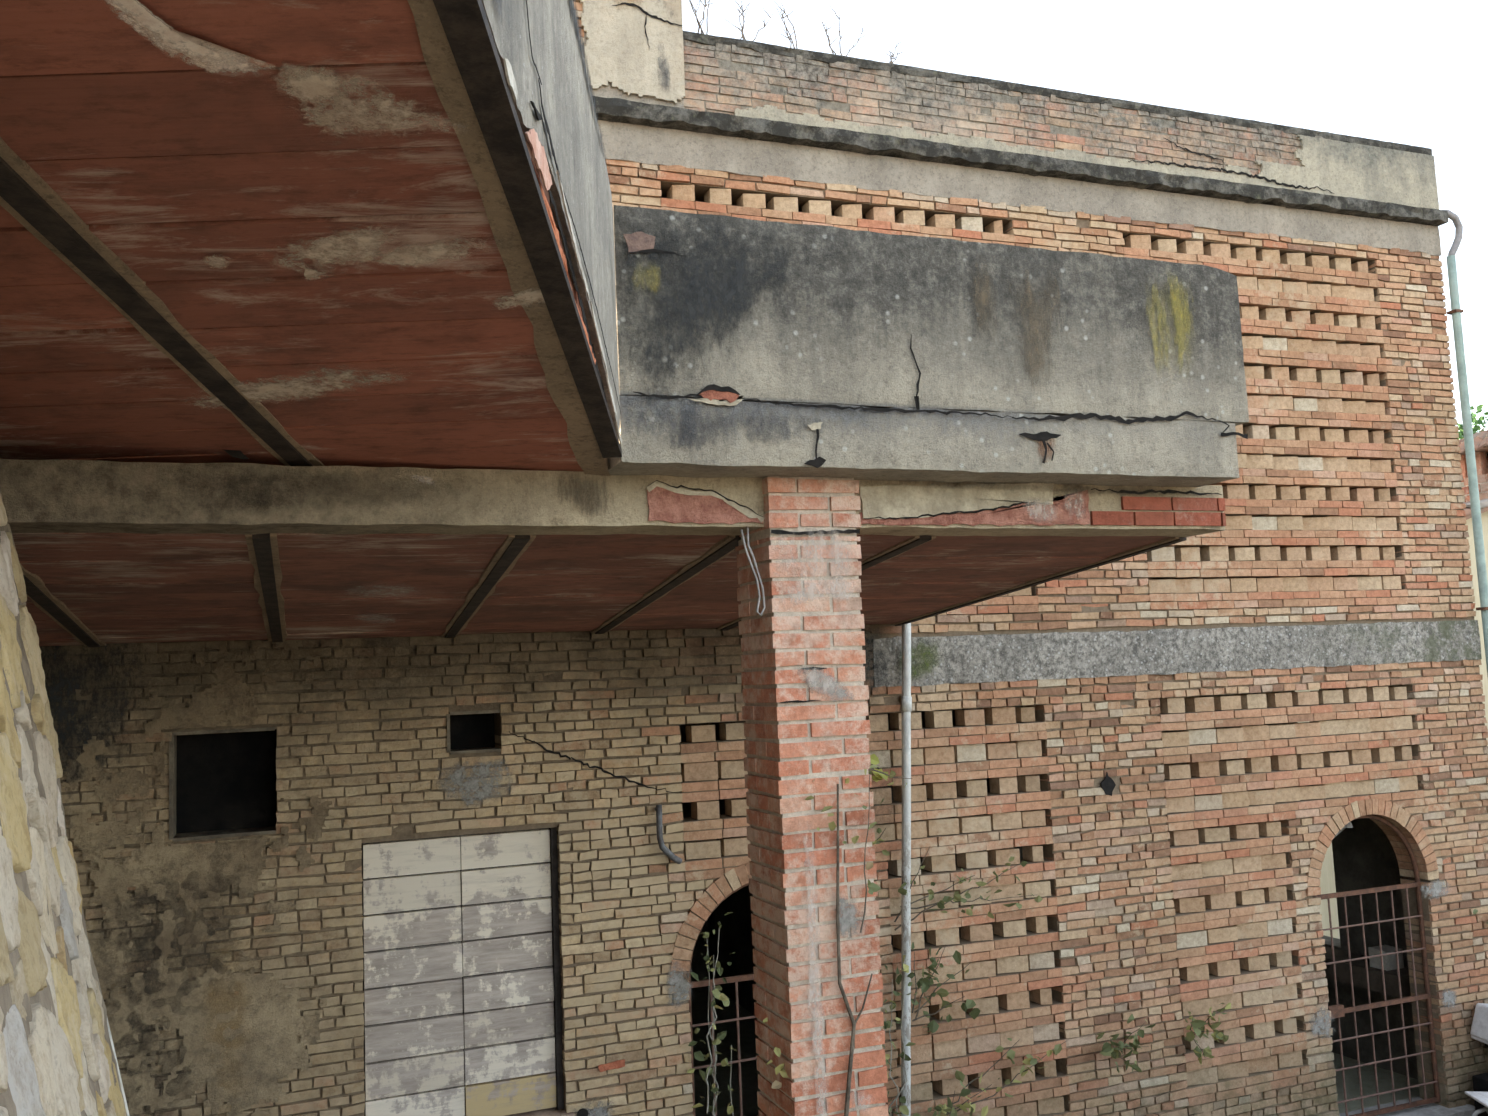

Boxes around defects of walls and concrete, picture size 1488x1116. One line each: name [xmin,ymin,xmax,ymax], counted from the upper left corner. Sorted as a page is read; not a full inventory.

peeling [503,58,518,102]
crack [1128,138,1332,193]
crack [526,0,703,413]
peeling [525,128,622,444]
spalling [687,384,745,406]
crack [739,334,1248,468]
peeling [646,480,765,524]
peeling [859,482,1226,526]
water stain [40,643,142,797]